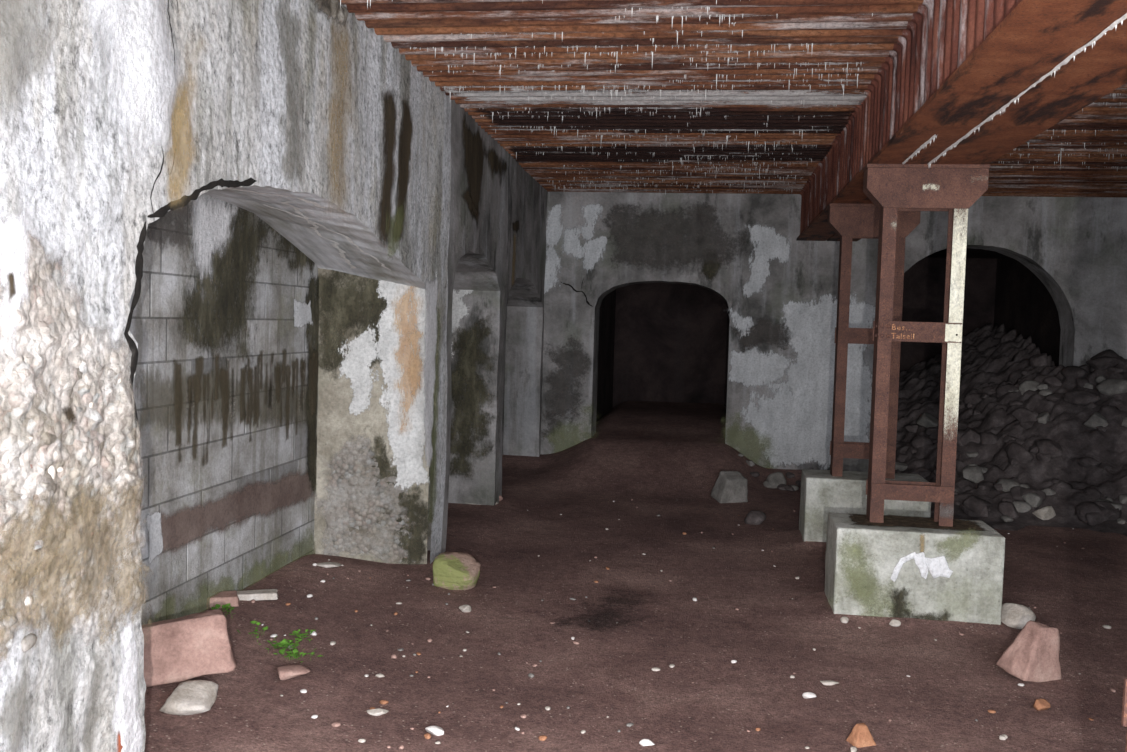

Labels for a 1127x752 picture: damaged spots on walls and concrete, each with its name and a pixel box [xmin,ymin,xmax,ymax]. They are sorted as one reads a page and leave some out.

leakage [278,5,302,177]
leakage [410,0,867,269]
leakage [902,13,1127,169]
leakage [141,276,319,552]
peeling [312,269,438,583]
peeling [451,290,473,359]
leakage [543,337,590,437]
peeling [544,204,607,294]
leakage [891,552,953,621]